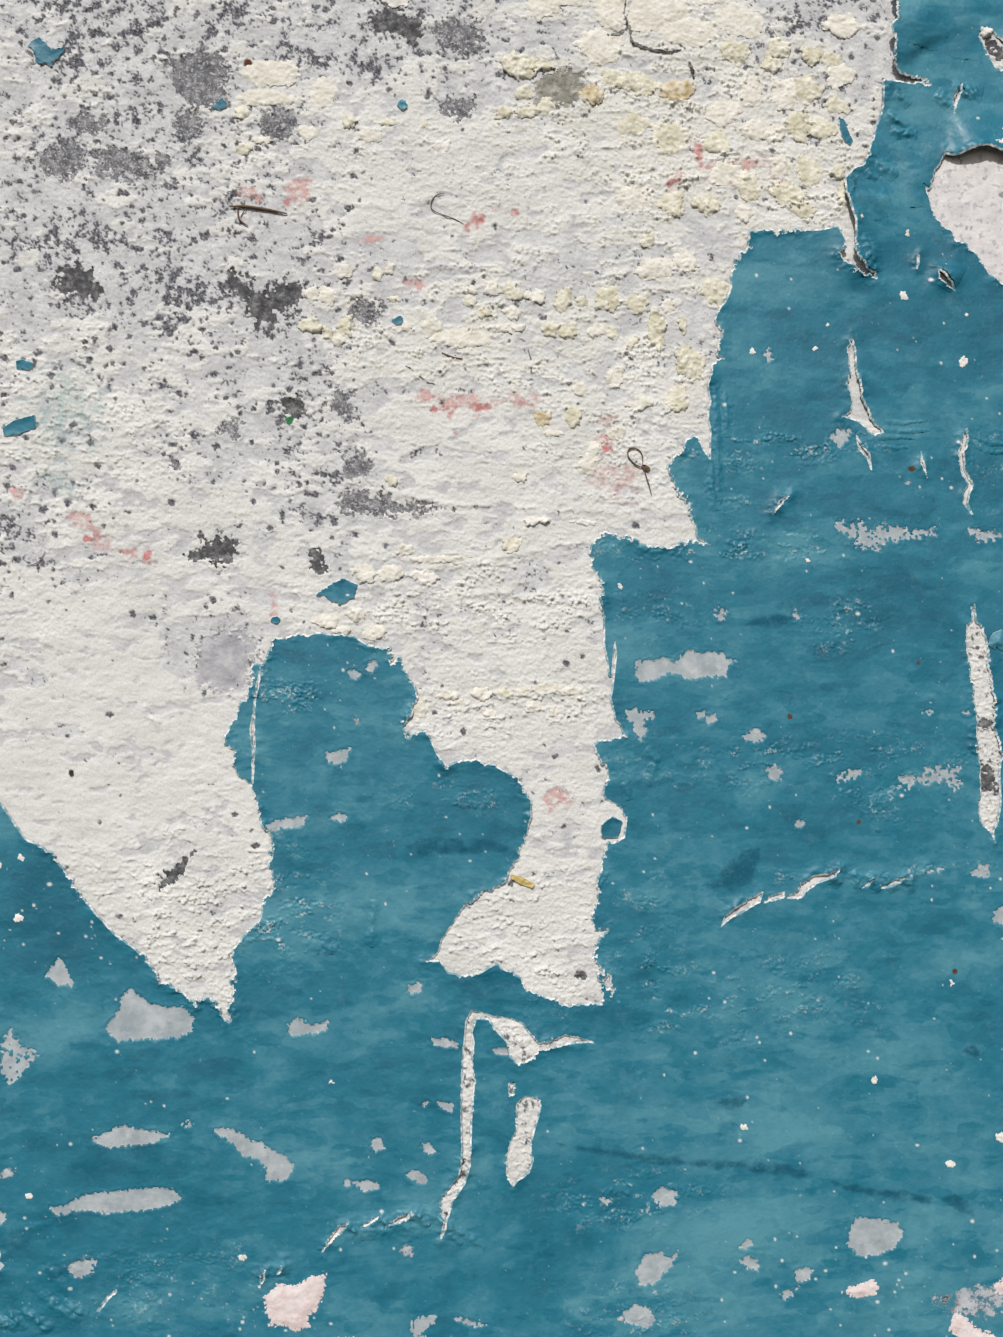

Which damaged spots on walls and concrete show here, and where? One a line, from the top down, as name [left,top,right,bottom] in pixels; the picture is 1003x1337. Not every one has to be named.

spalling [980,27,1003,61]
peeling [927,145,1003,283]
peeling [0,0,940,1043]
peeling [967,527,1002,543]
peeling [896,764,963,792]
spalling [980,760,997,791]
peeling [970,863,990,878]
peeling [992,906,1003,925]
peeling [0,1028,40,1085]
peeling [431,1037,459,1048]
peeling [422,1101,454,1113]
peeling [505,1084,540,1184]